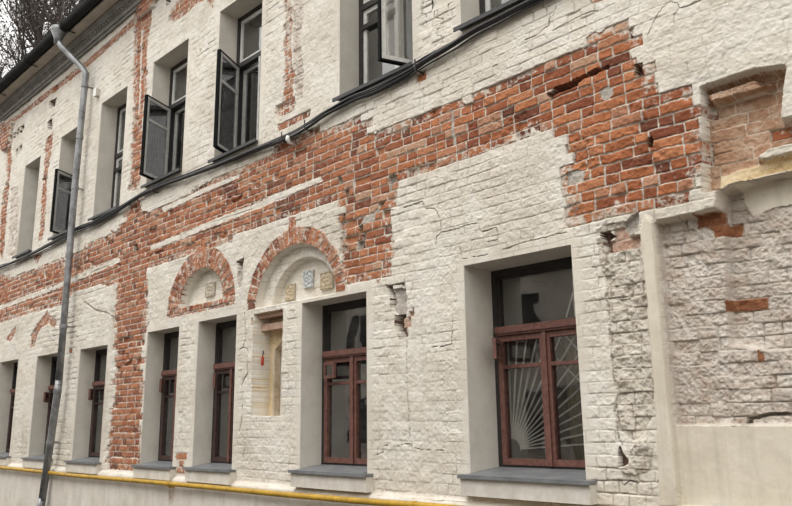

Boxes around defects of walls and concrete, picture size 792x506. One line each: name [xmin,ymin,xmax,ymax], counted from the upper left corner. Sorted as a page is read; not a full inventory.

crack [649,0,702,32]
peeling [0,0,158,259]
peeling [770,121,792,142]
peeling [70,0,719,474]
crack [337,174,566,259]
flaking render [692,211,744,238]
peeling [0,253,65,347]